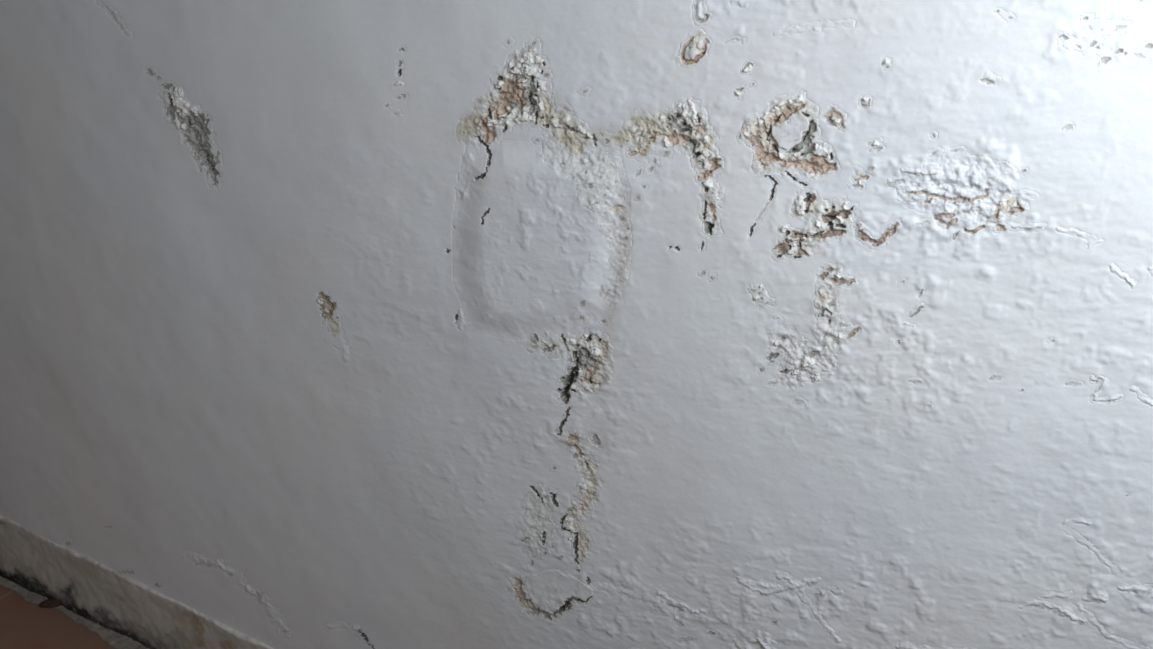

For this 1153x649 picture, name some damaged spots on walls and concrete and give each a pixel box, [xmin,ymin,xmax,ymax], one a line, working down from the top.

peeling [734,60,756,101]
peeling [980,71,1001,85]
peeling [145,66,223,191]
flaking render [456,36,725,405]
peeling [736,91,1047,407]
peeling [316,290,353,363]
crack [518,405,604,585]
water stain [0,569,155,649]
crack [322,621,377,649]